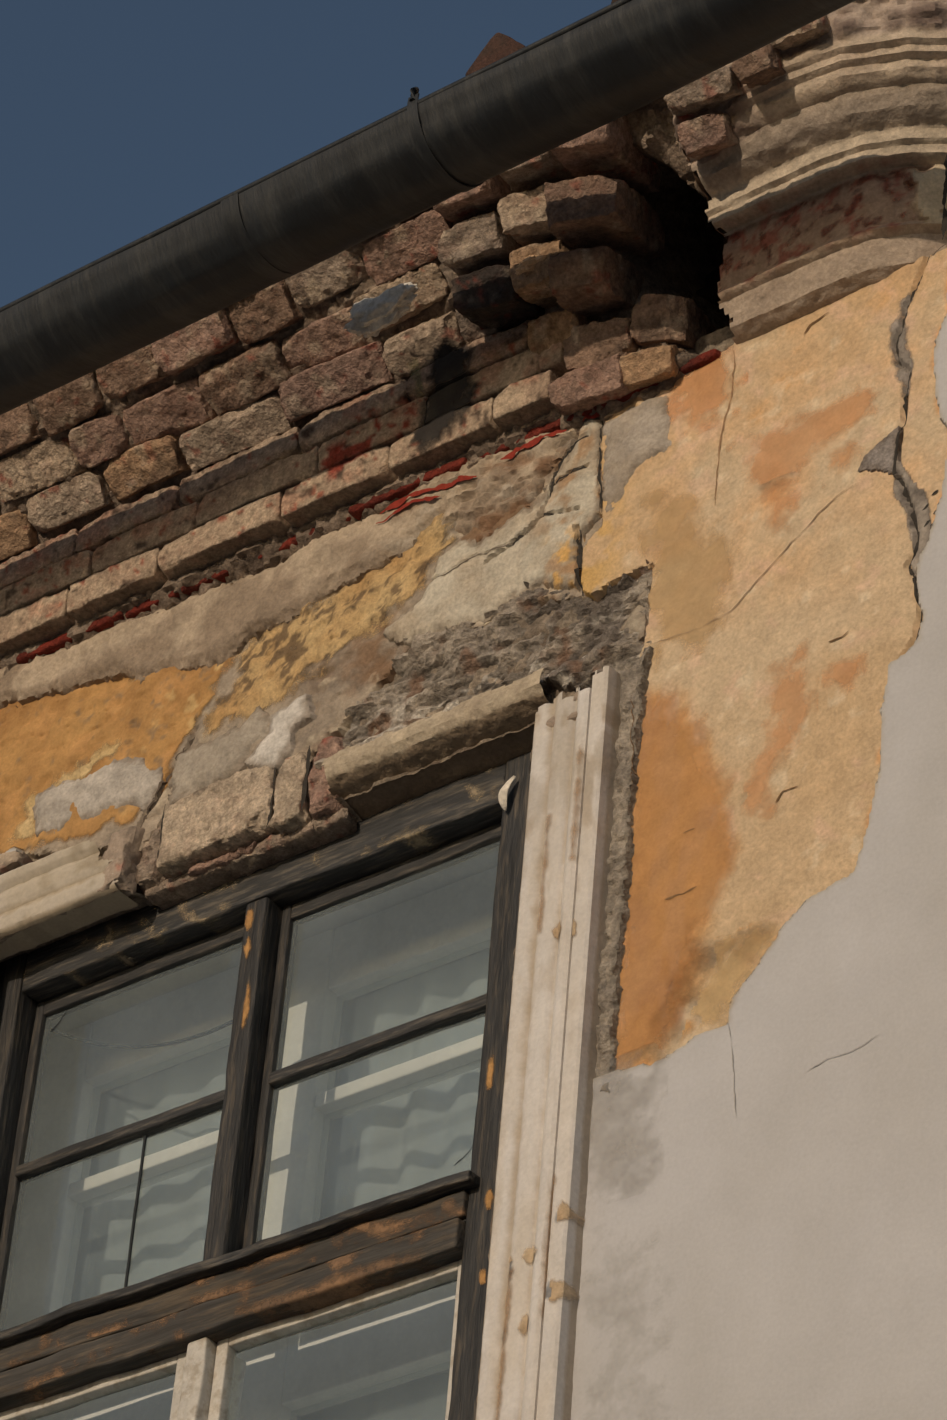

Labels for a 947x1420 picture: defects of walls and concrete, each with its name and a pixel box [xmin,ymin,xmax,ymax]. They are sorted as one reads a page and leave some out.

crack [714,351,735,498]
crack [890,155,947,639]
spalling [0,15,947,1093]
spalling [509,1247,536,1264]
spalling [518,1315,528,1334]
spalling [557,1201,585,1221]